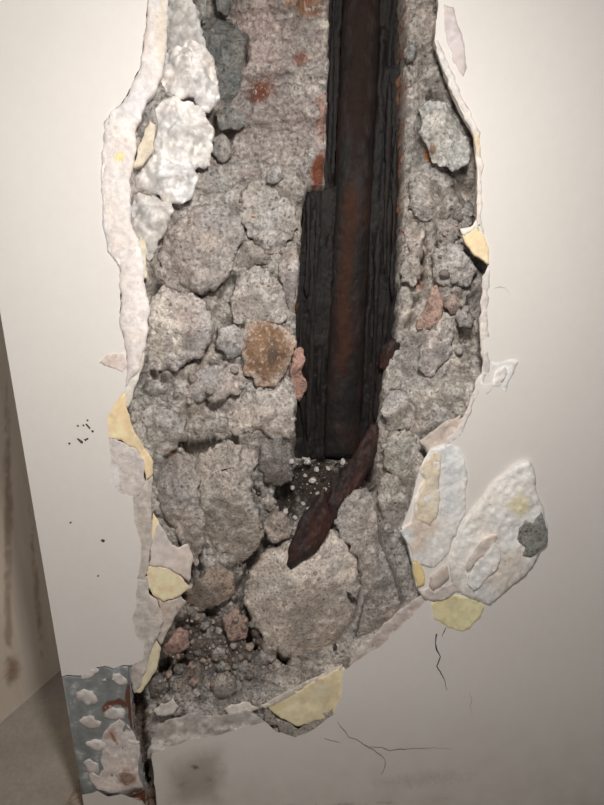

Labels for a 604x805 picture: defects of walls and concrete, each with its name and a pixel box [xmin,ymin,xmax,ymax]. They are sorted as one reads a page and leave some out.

corrosion [314,0,336,184]
corrosion [295,193,322,442]
spalling [107,0,548,805]
corrosion [373,113,405,423]
corrosion [102,685,133,729]
corrosion [121,773,153,805]
crack [324,723,446,774]
crack [435,628,447,689]